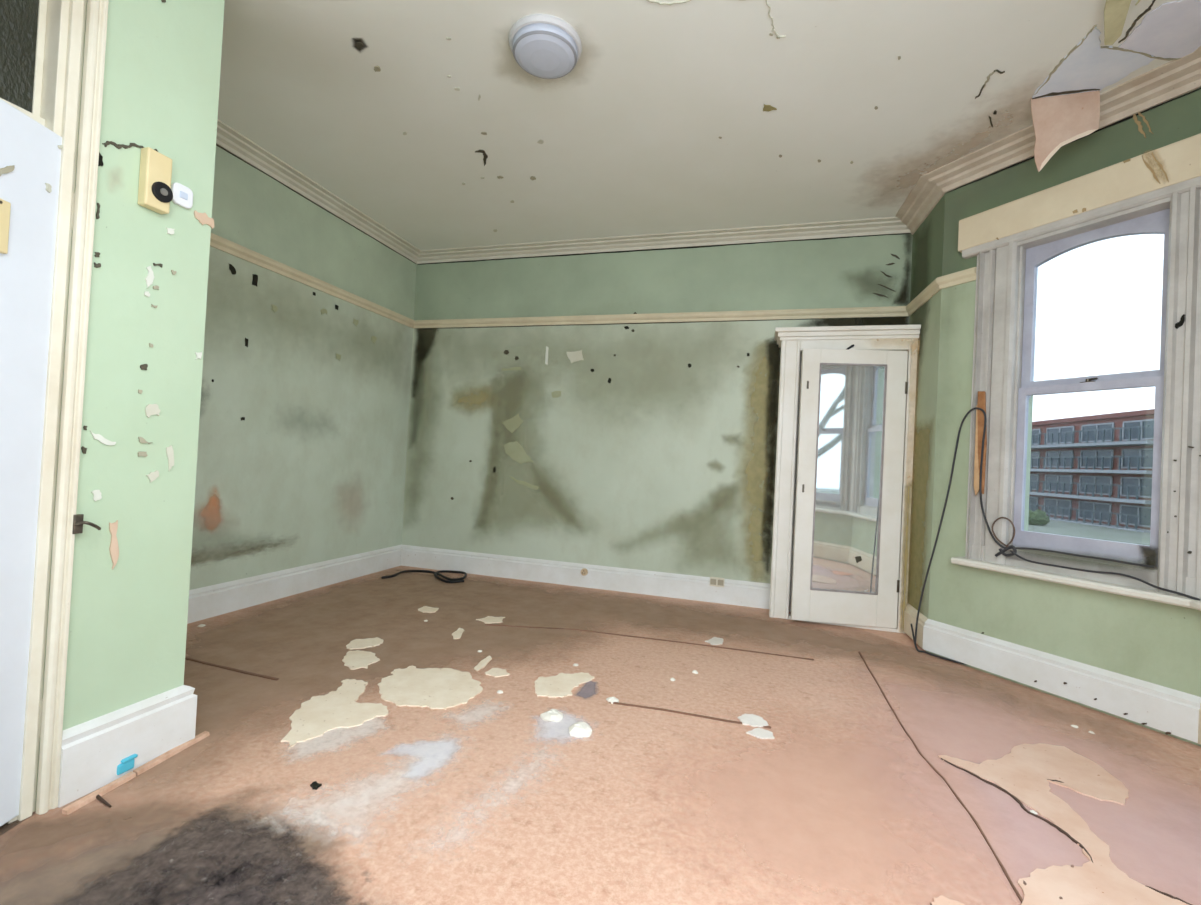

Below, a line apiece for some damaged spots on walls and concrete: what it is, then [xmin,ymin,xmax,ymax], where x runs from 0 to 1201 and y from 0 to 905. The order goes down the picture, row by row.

crack [647,0,691,8]
crack [766,0,785,37]
peeling [1032,0,1201,99]
damp [810,235,928,380]
damp [413,328,437,396]
damp [745,340,781,578]